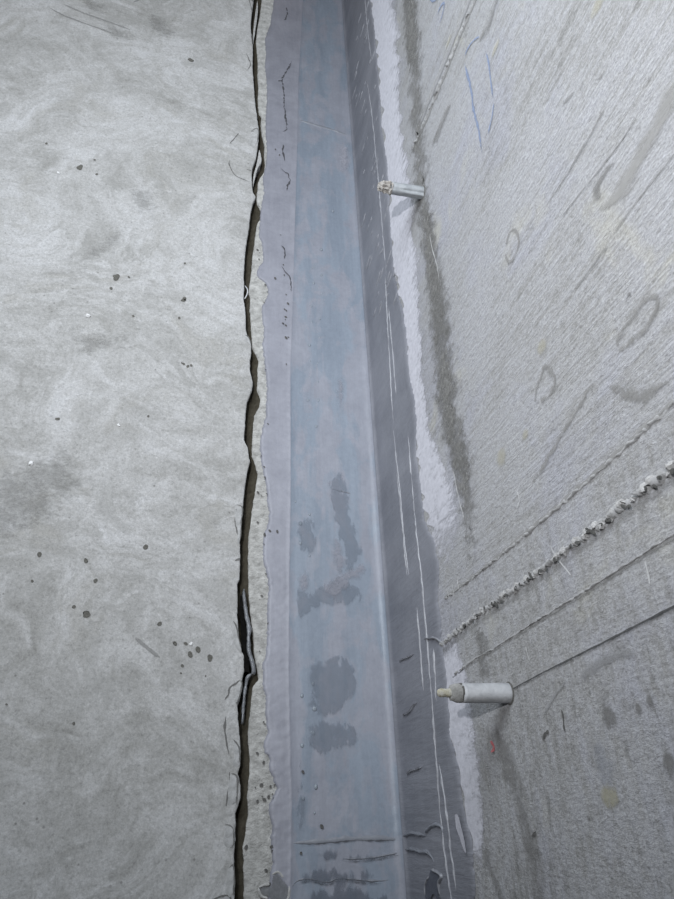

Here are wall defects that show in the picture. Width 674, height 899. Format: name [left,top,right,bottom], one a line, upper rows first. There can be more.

crack [234,0,291,899]
water stain [371,0,472,559]